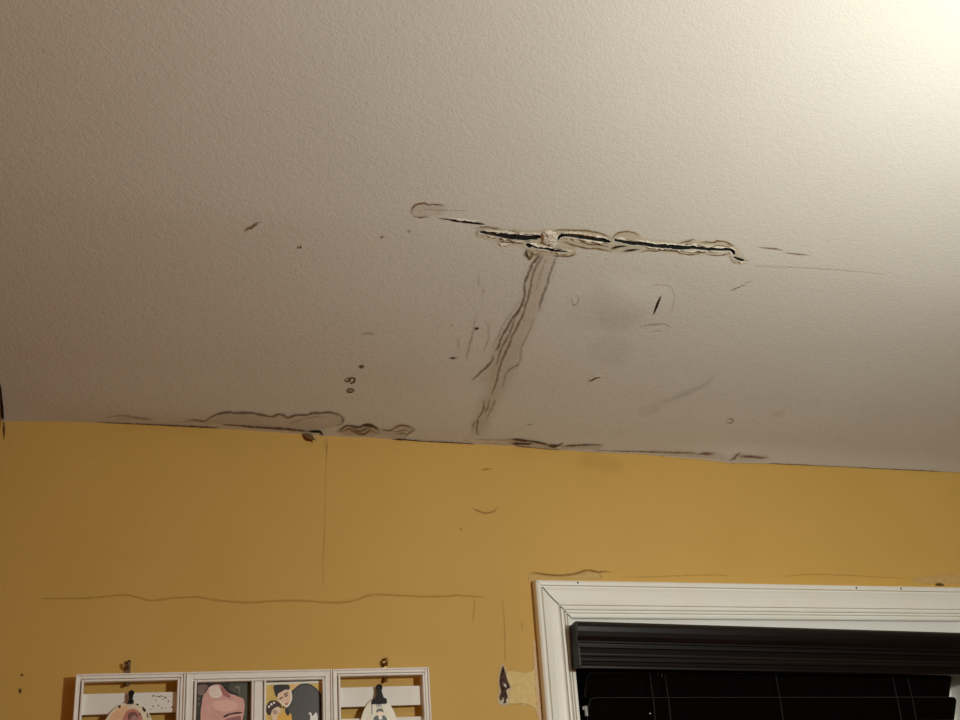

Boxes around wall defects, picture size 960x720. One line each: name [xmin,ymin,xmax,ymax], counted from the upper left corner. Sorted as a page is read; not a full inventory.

water stain [540,229,639,304]
crack [440,218,805,263]
water stain [648,239,733,256]
water stain [474,226,541,391]
spalling [498,665,536,711]